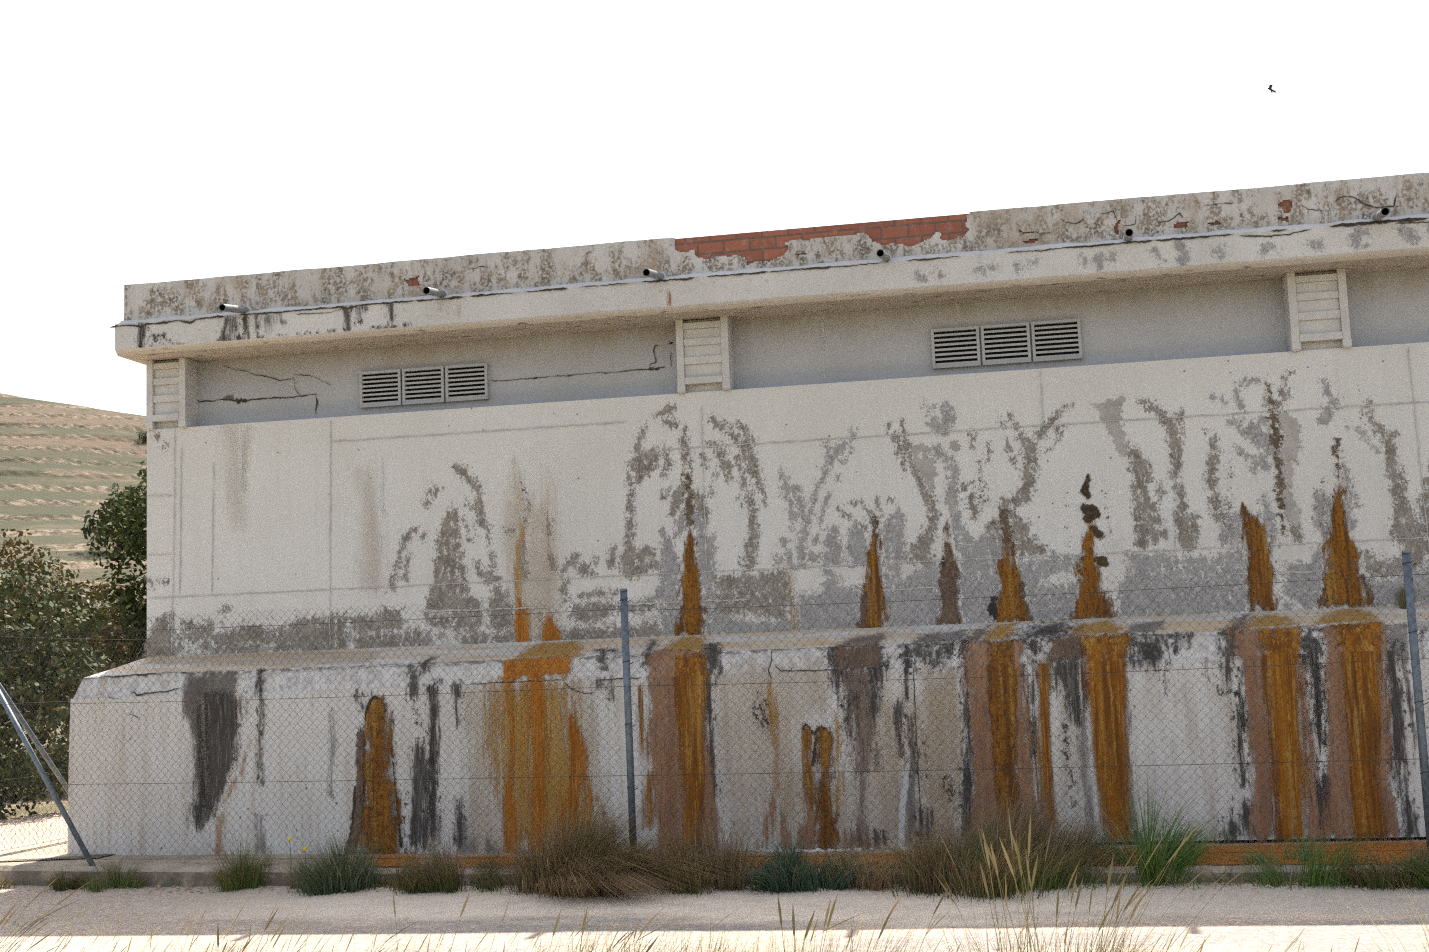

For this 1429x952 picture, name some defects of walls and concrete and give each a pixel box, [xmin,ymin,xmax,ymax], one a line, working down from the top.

crack [197,366,328,413]
spalling [675,214,969,265]
water stain [182,668,266,832]
water stain [402,656,500,854]
corrosion [344,479,615,867]
corrosion [638,472,920,867]
water stain [823,521,970,850]
corrosion [957,506,1057,862]
corrosion [1062,437,1427,865]